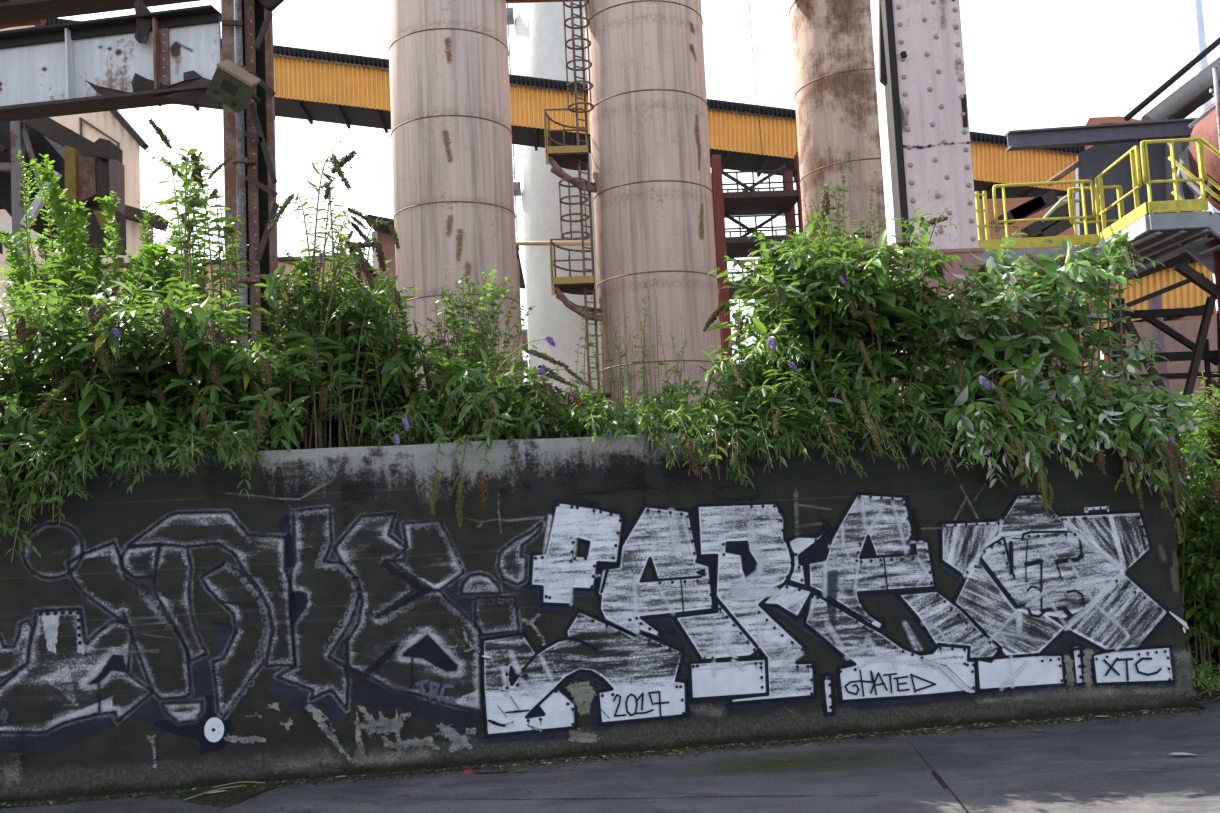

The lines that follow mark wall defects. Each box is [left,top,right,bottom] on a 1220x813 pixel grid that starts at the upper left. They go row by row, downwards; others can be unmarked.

corrosion [828,0,861,39]
corrosion [798,71,870,114]
corrosion [443,131,452,162]
corrosion [446,216,471,283]
leakage [201,459,309,504]
leakage [327,446,406,524]
leakage [602,451,644,489]
peeling [246,702,293,730]
peeling [274,704,476,774]